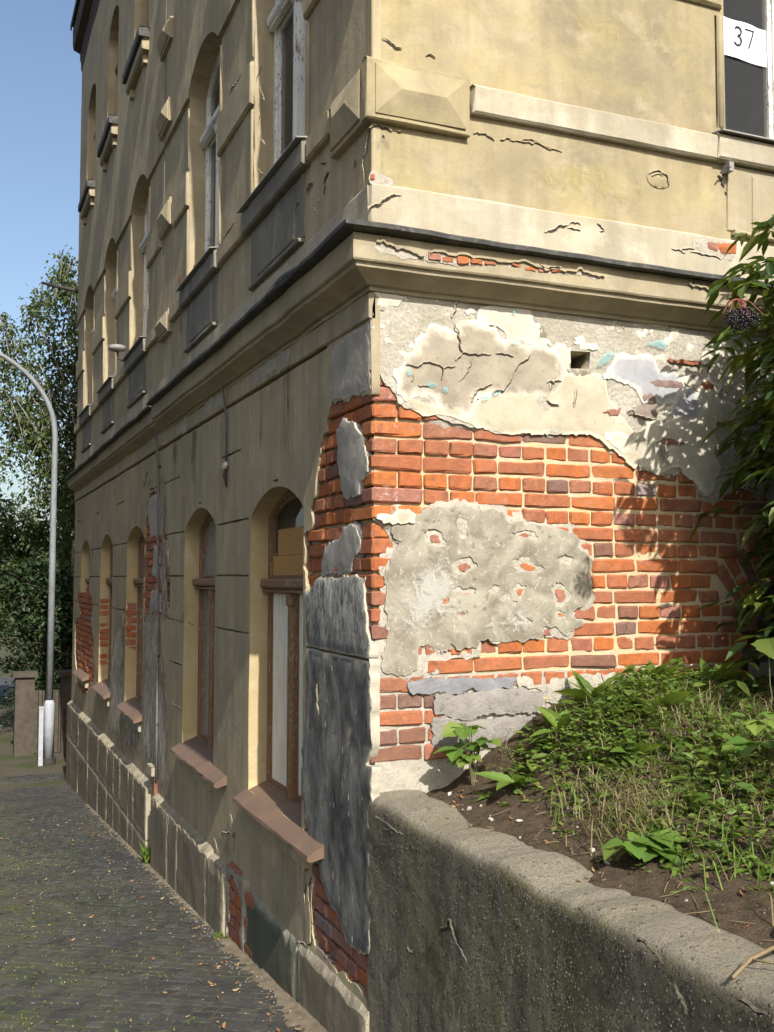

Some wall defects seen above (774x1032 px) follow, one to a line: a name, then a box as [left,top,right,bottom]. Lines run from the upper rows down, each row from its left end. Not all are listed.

crack [474,131,562,152]
crack [294,124,402,216]
flaking render [374,238,605,280]
flaking render [693,238,737,261]
flaking render [688,282,710,292]
peeling [251,347,291,387]
crack [406,301,531,401]
peeling [203,392,223,416]
crack [547,379,578,406]
peeling [75,477,175,797]
flaking render [301,292,774,997]
flaking render [225,862,254,959]